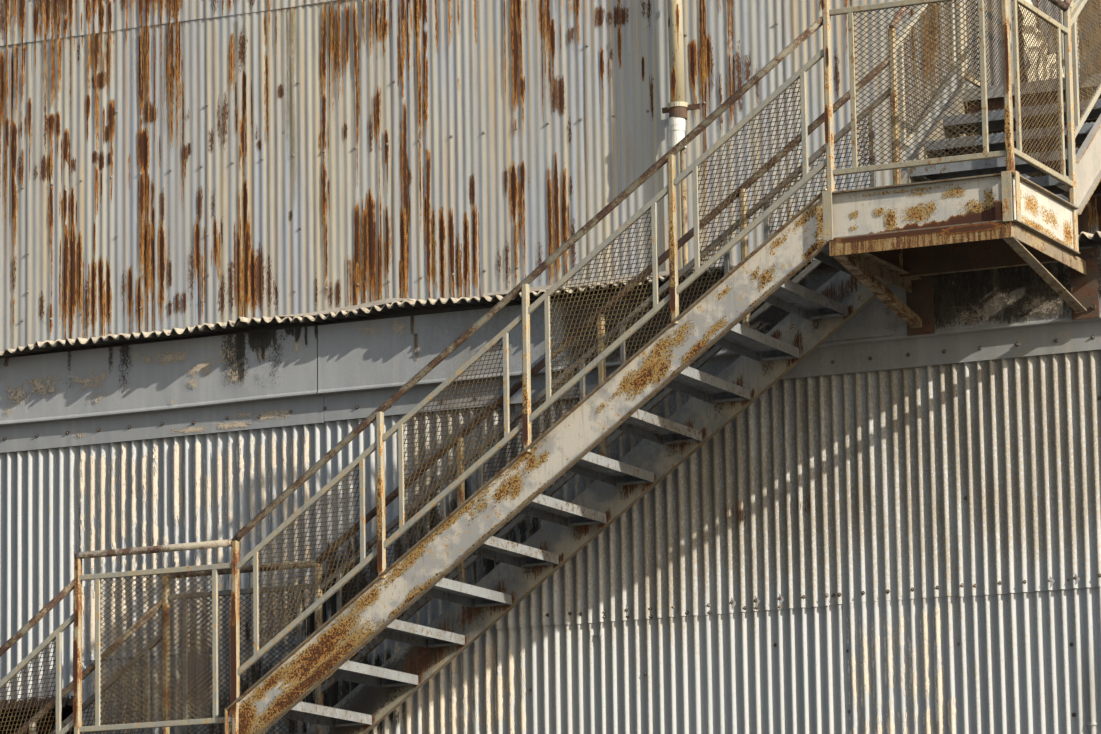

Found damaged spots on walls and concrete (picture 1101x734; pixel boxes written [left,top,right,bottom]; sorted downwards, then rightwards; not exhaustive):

rust [0,0,295,340]
rust [314,0,481,308]
rust [497,153,577,288]
rust [504,0,652,142]
rust [641,55,654,118]
rust [668,0,759,193]
rust [1087,196,1101,234]
damp [109,345,131,392]
damp [222,326,318,387]
rust [595,183,1073,416]
damp [933,262,1071,331]
rust [229,373,551,734]